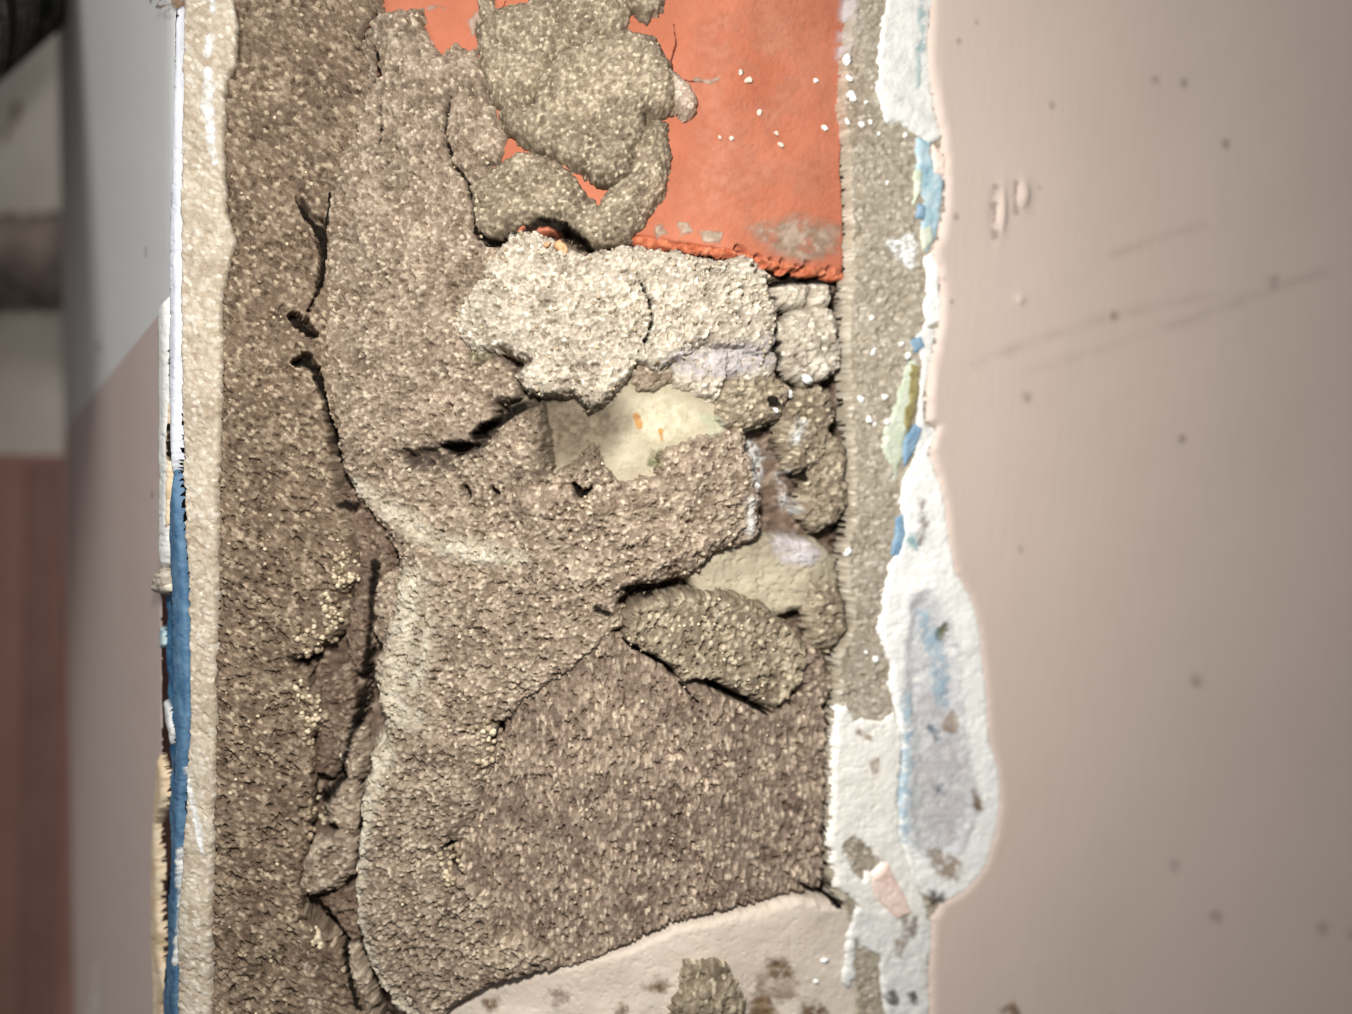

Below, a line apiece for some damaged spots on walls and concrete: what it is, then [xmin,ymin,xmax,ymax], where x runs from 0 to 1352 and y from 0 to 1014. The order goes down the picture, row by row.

crack [445,98,596,253]
crack [289,191,361,512]
crack [640,283,653,343]
crack [767,276,833,368]
peeling [824,0,1000,1014]
crack [287,652,324,663]
crack [593,581,769,715]
crack [308,559,381,1012]